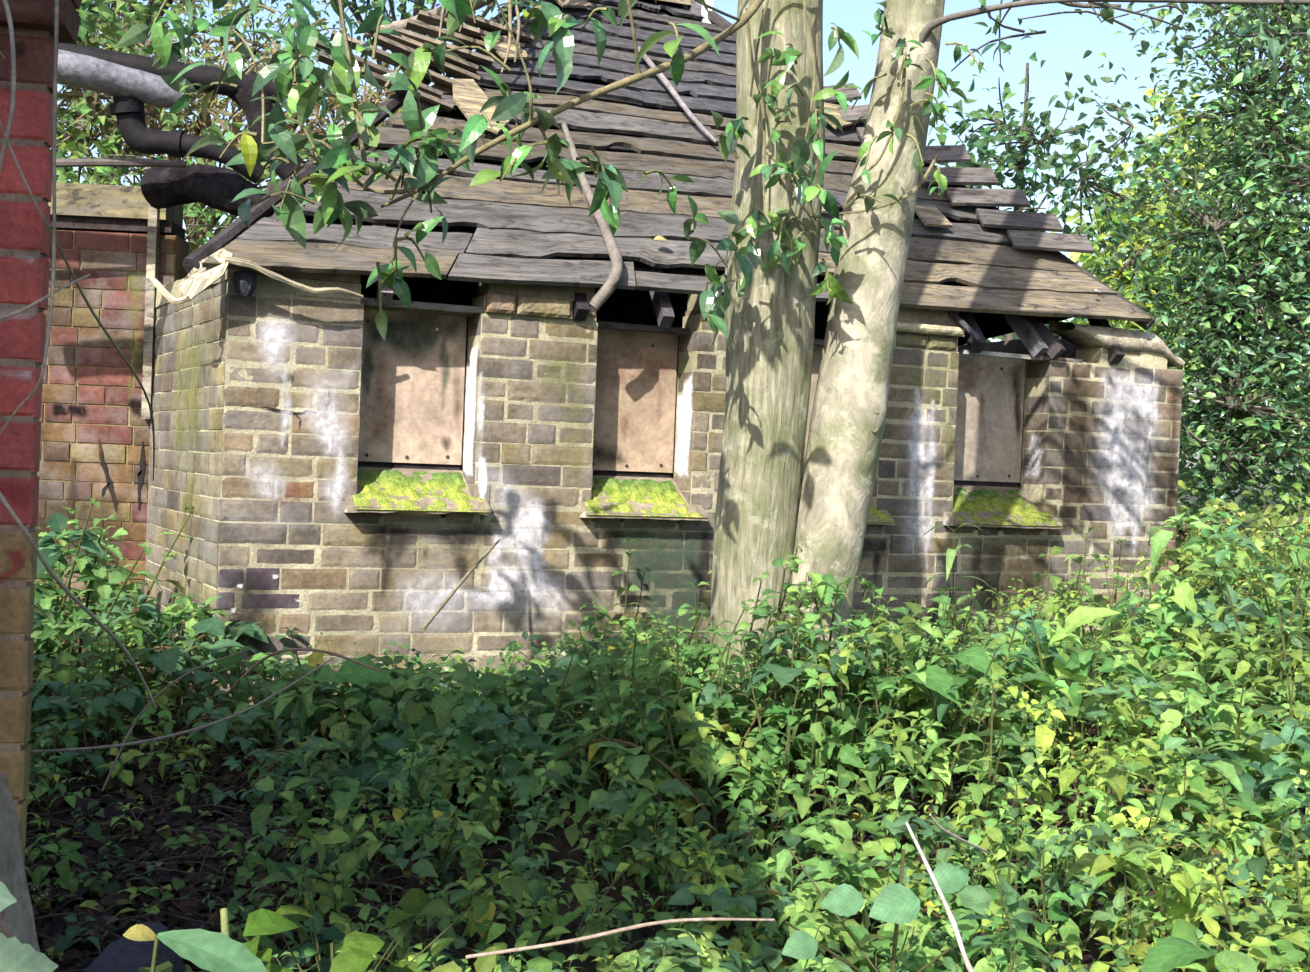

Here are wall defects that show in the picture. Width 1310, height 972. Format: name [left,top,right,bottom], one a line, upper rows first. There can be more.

leakage [264,323,287,361]
leakage [312,411,343,501]
leakage [911,438,952,498]
leakage [1064,378,1156,543]
leakage [370,526,412,585]
leakage [439,488,557,602]